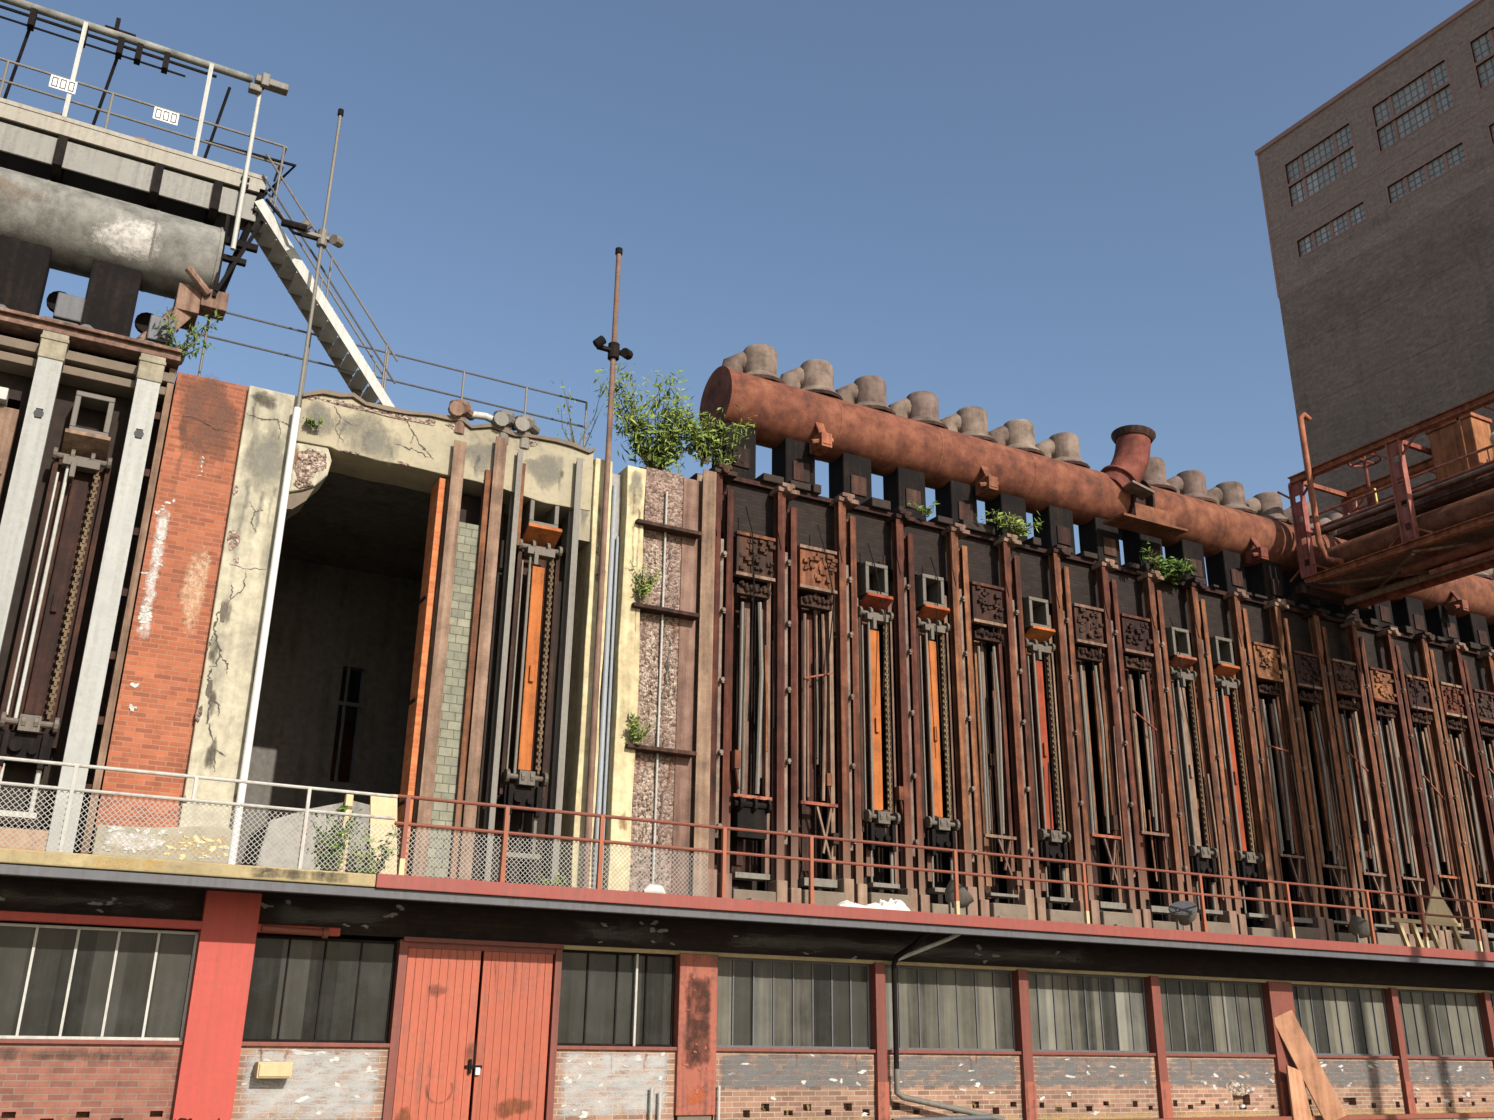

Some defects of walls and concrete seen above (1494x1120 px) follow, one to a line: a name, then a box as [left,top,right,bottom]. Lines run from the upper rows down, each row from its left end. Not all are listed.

peeling [137,499,175,630]
crack [206,564,261,772]